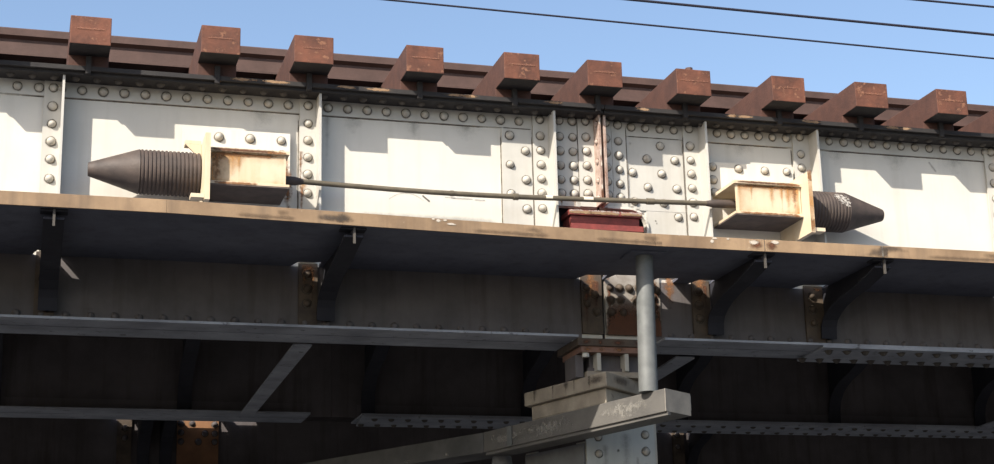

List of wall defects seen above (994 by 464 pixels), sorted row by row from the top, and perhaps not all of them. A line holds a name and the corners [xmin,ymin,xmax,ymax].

corrosion [583,275,638,352]
corrosion [654,278,674,337]